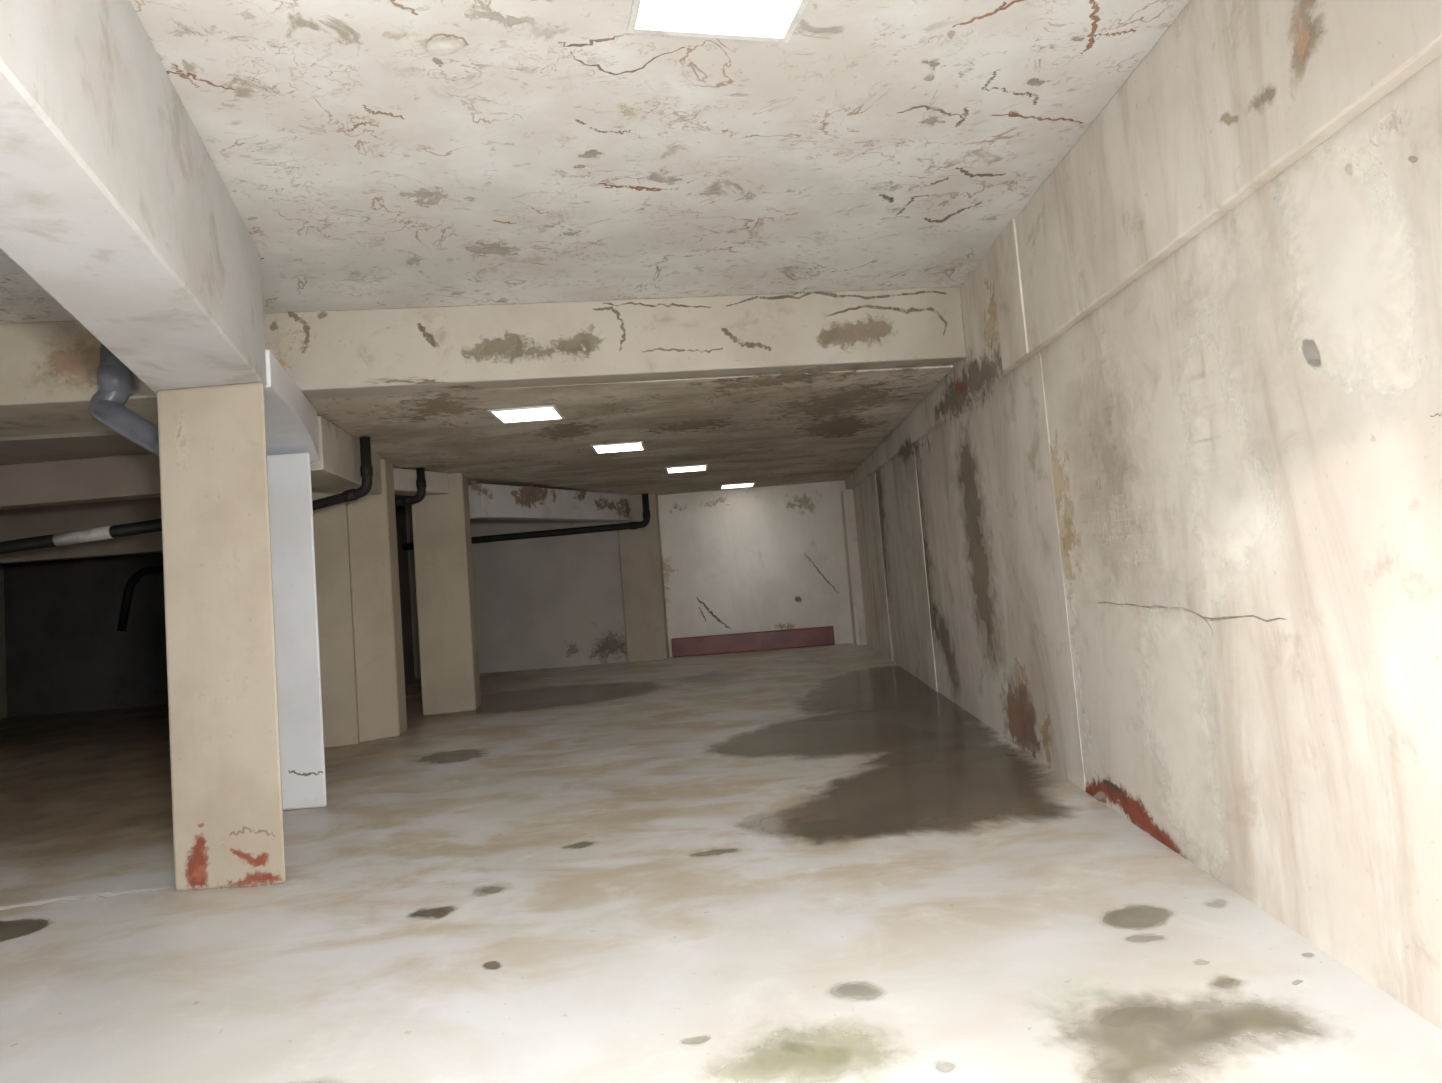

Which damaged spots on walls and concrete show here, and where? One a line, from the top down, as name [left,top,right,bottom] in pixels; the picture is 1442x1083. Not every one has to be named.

crack [948,0,1024,38]
crack [1080,0,1136,54]
crack [559,36,685,75]
peeling [462,306,626,363]
crack [603,291,946,353]
peeling [817,305,947,349]
water stain [387,379,473,422]
water stain [698,365,922,438]
water stain [935,351,1003,420]
water stain [537,423,597,441]
crack [1099,602,1284,637]
corrosion [185,823,282,889]